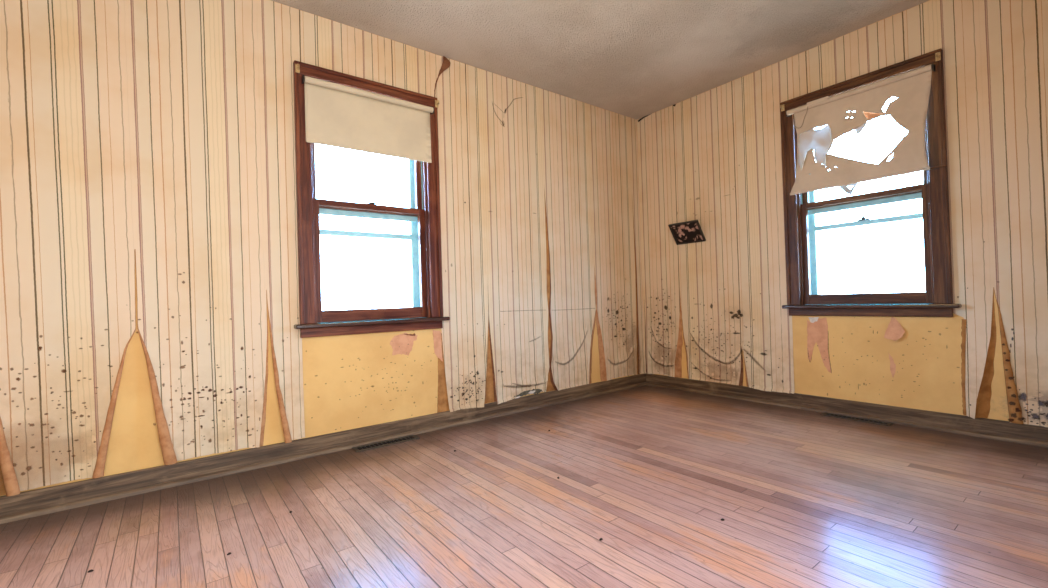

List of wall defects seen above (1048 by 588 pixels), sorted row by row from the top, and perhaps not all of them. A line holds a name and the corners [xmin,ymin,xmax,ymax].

peeling [434,56,450,97]
water stain [0,335,101,452]
flaking render [104,262,164,474]
water stain [155,364,260,453]
flaking render [263,293,285,446]
peeling [390,333,418,356]
water stain [450,366,485,405]
flaking render [486,337,494,403]
water stain [647,293,767,379]
peeling [807,317,832,373]
flaking render [988,288,1009,421]
water stain [1002,329,1048,425]